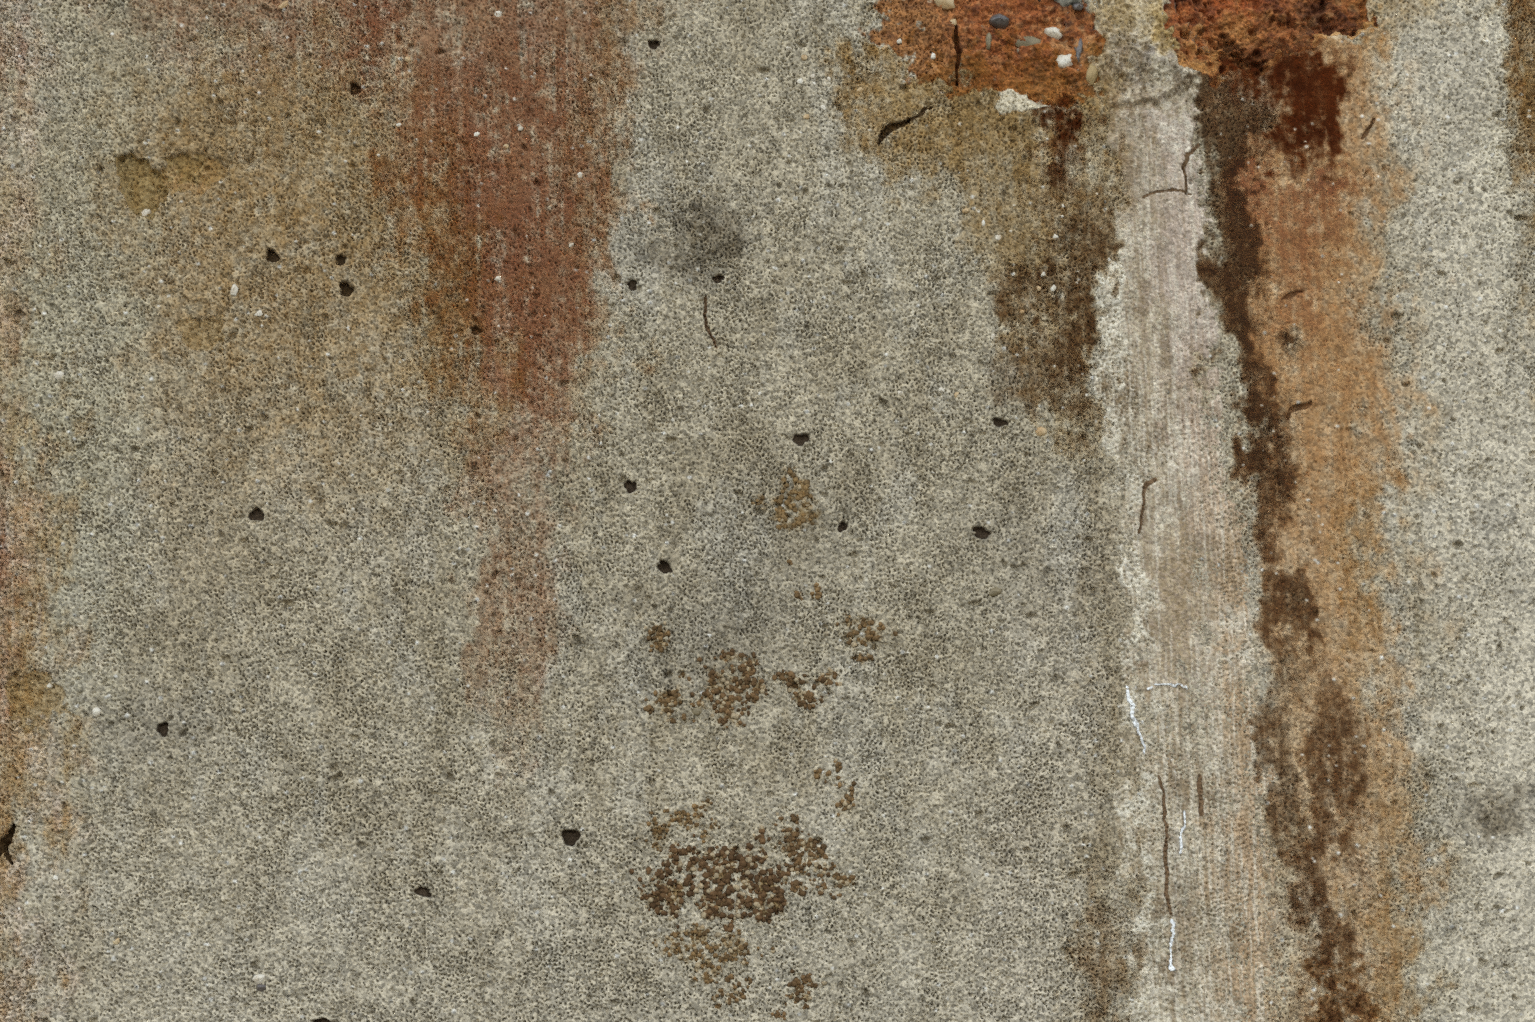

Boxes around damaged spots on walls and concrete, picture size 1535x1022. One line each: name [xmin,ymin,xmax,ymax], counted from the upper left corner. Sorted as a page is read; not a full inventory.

spalling [858,0,1106,114]
spalling [1163,0,1378,93]
corrosion [1219,49,1346,168]
water stain [1086,0,1317,1022]
crack [1126,683,1204,971]